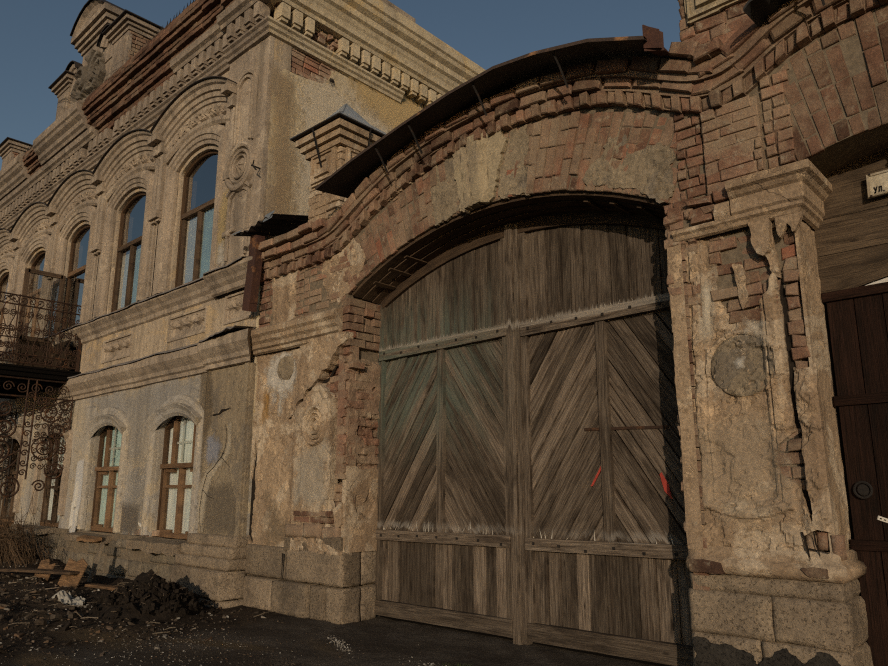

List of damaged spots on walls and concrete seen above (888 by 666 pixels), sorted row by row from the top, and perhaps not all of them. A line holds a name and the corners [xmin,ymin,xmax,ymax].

peeling [290,48,393,133]
peeling [293,154,311,215]
spalling [415,167,437,228]
spalling [526,111,603,195]
spalling [684,190,731,226]
spalling [708,211,811,370]
crack [778,278,829,561]
crack [199,408,229,530]
spalling [322,479,347,530]